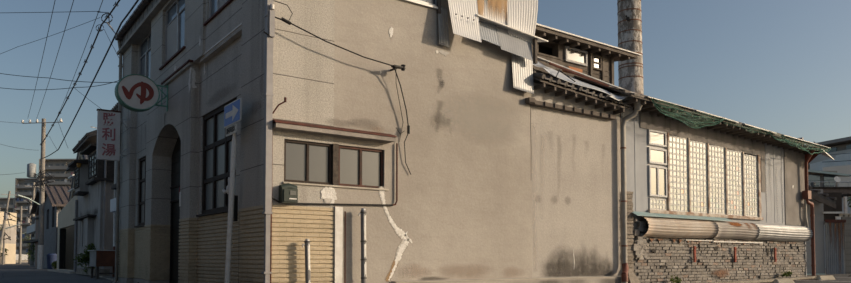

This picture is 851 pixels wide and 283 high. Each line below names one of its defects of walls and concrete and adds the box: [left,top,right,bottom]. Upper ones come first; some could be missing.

corrosion [477,0,507,16]
damp [547,249,611,277]